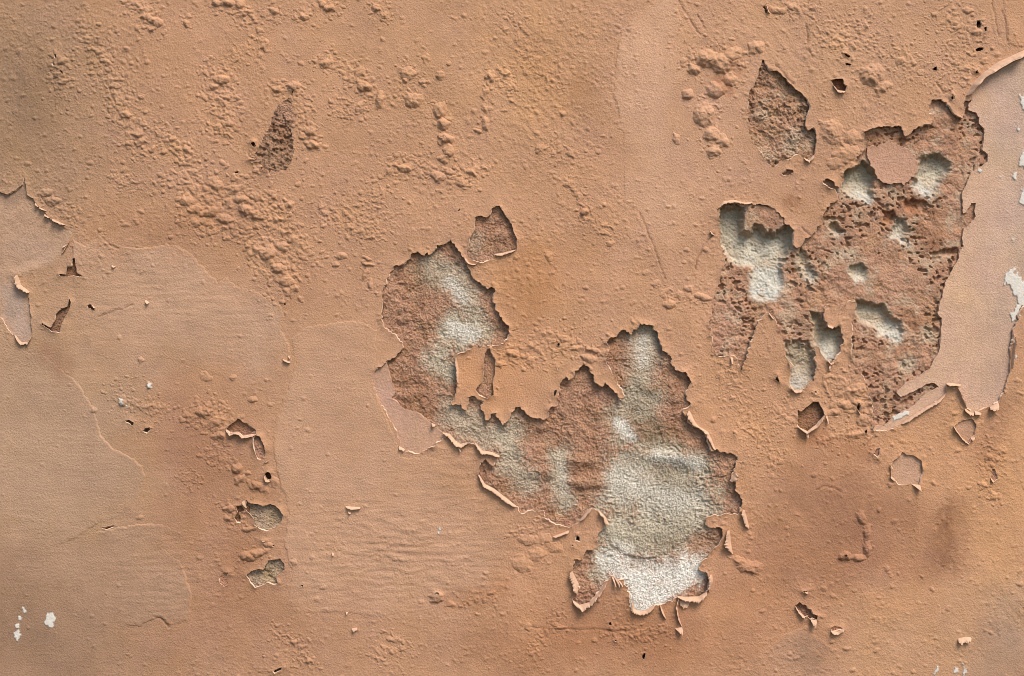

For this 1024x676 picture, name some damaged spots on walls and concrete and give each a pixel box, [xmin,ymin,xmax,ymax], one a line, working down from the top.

peeling [248,90,297,176]
peeling [0,180,81,345]
flaking render [709,50,1024,445]
peeling [226,419,271,483]
flaking render [373,206,749,635]
peeling [890,453,922,493]
peeling [235,500,283,546]
peeling [247,559,284,587]
peeling [795,591,817,628]